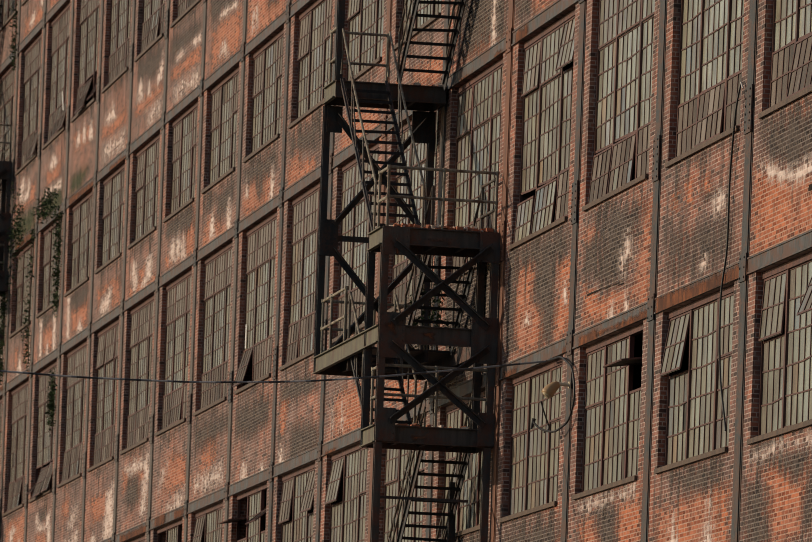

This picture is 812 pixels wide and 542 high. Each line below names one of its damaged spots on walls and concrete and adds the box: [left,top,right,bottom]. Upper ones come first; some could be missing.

damp [173,9,201,62]
damp [104,76,128,123]
damp [138,60,164,125]
damp [174,71,198,100]
damp [73,106,94,145]
efflorescence [102,132,125,160]
damp [18,159,35,205]
efflorescence [762,159,812,183]
damp [35,495,51,542]
damp [91,461,115,542]
damp [123,443,149,515]
damp [669,469,680,542]